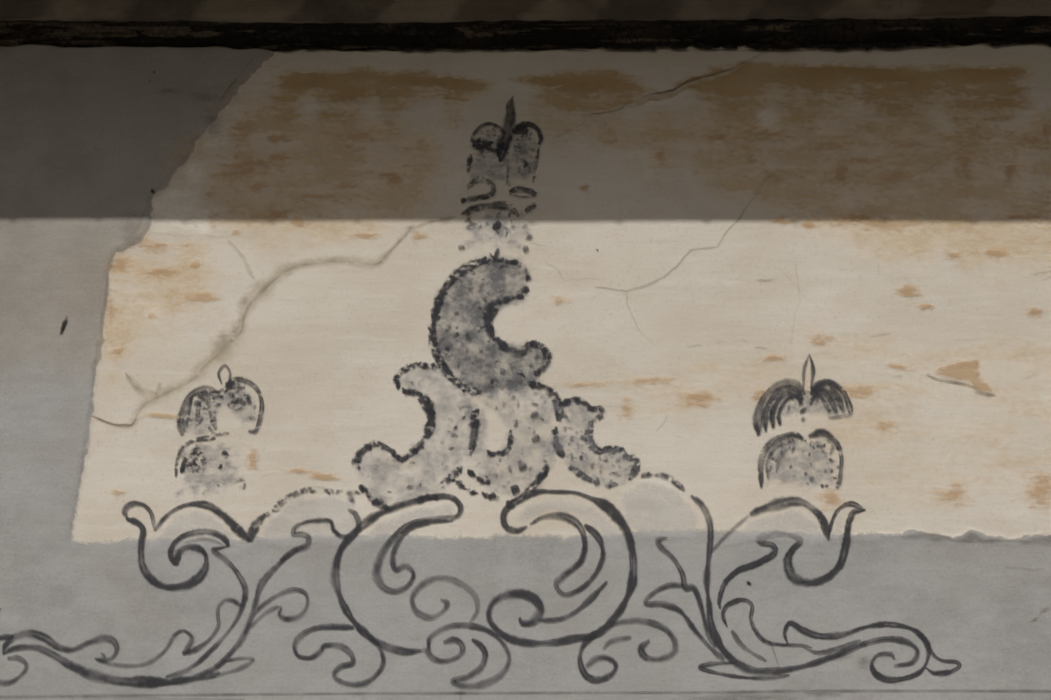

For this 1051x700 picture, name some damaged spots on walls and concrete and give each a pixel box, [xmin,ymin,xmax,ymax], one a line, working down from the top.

peeling [49,23,319,38]
water stain [274,70,485,117]
water stain [520,70,642,111]
water stain [678,63,1026,134]
crack [211,264,303,360]
flaking render [72,27,1051,542]